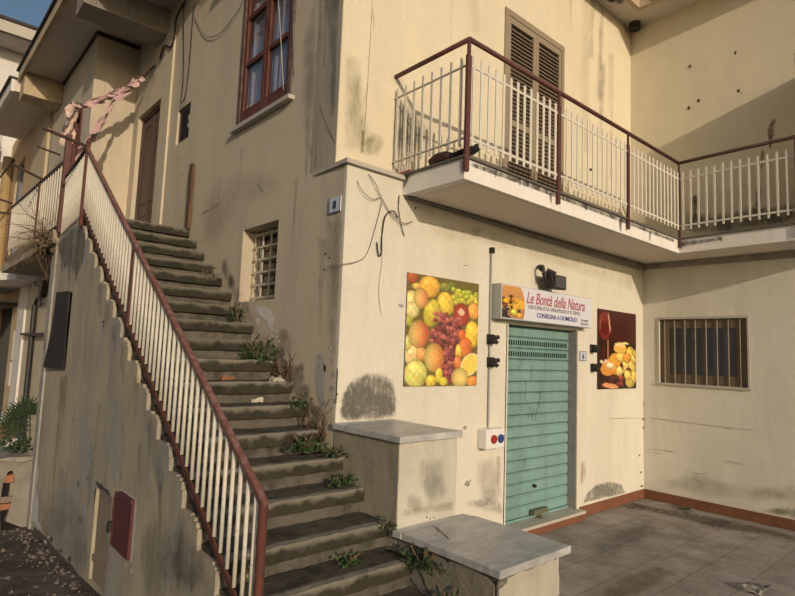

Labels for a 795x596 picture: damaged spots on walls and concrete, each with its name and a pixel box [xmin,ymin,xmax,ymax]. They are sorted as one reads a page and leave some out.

damp [59,227,85,279]
peeling [310,346,338,407]
damp [342,375,395,419]
damp [584,483,624,502]